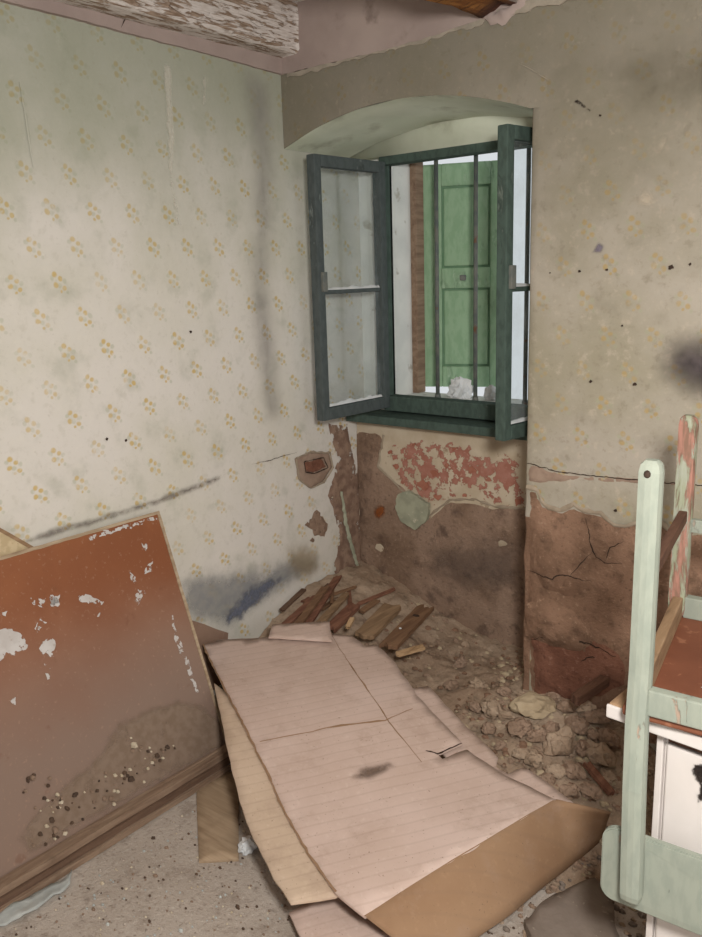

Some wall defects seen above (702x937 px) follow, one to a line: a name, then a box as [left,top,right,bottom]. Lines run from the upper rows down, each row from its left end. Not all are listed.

spalling [482,0,526,26]
leakage [674,347,702,385]
leakage [188,565,304,622]
spalling [295,423,638,710]
crack [528,518,622,581]
spalling [656,552,671,632]
spalling [688,532,702,597]